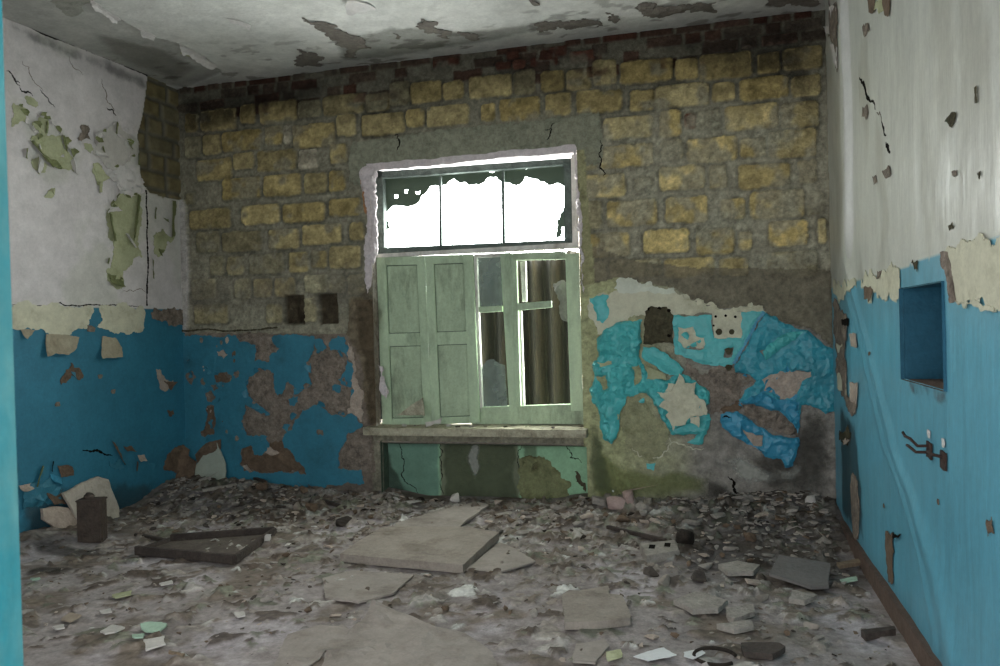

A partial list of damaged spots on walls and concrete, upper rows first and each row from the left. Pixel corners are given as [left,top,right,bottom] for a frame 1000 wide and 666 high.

crack [8,62,55,107]
crack [31,28,148,116]
spalling [302,17,371,59]
spalling [635,2,717,18]
crack [859,77,890,154]
peeling [11,96,177,290]
crack [13,190,149,307]
peeling [359,144,900,468]
peeling [940,233,1000,312]
peeling [12,300,364,488]
crack [82,448,112,456]
crack [399,444,444,494]